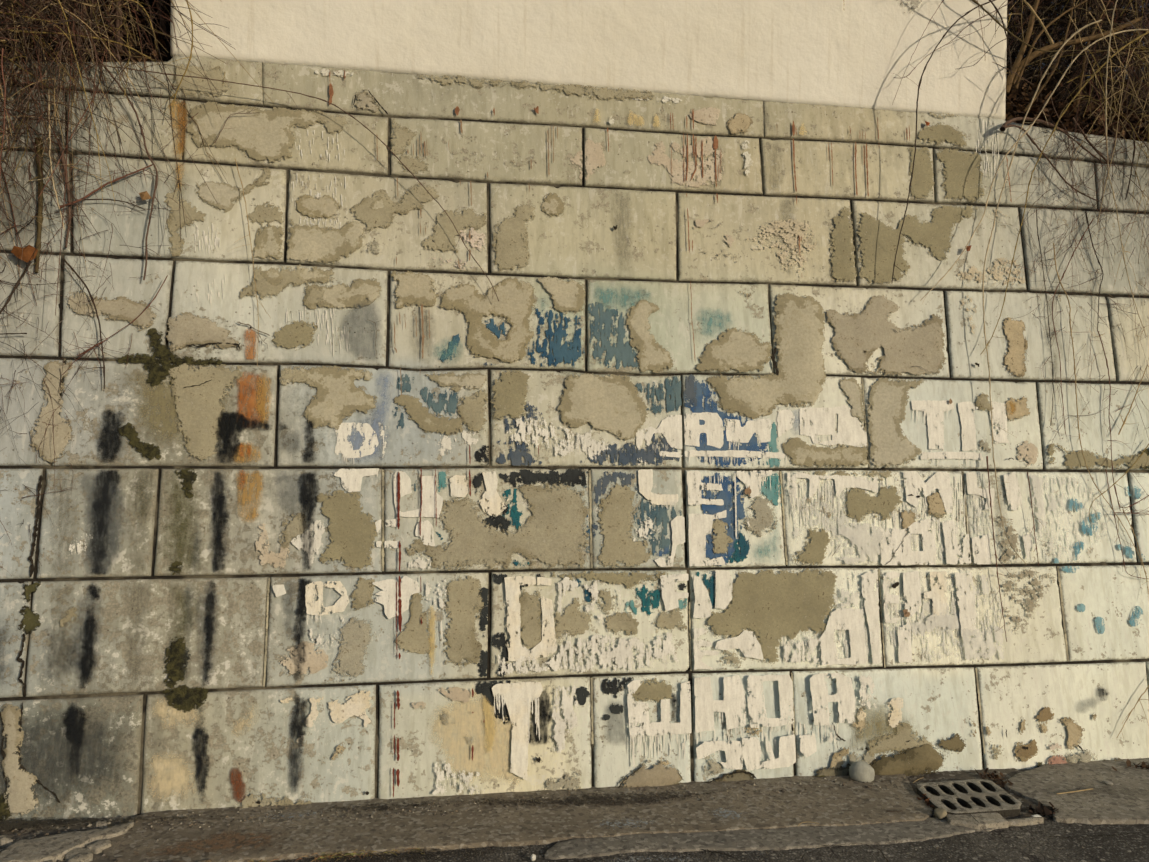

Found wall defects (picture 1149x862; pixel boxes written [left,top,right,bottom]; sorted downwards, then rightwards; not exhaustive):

spalling [421,207,487,270]
corrosion [670,110,721,253]
spalling [395,481,687,666]